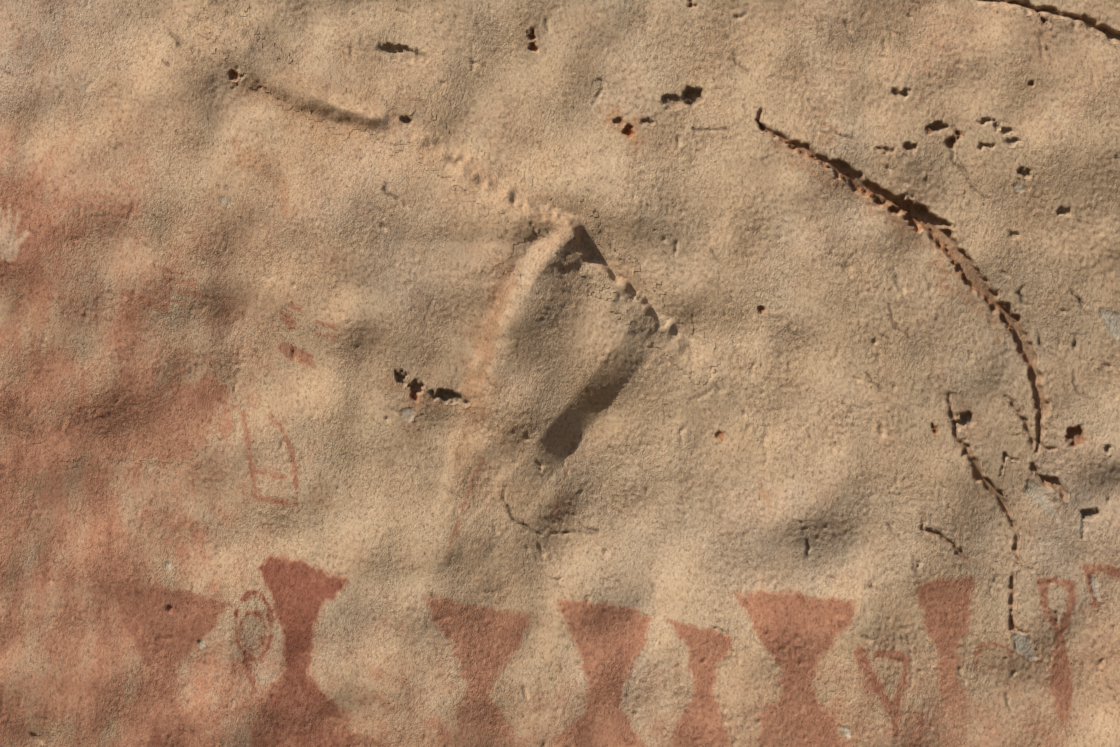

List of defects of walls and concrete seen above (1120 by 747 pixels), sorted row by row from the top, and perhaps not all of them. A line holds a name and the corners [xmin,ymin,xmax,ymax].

crack [968,0,1120,44]
crack [731,50,751,76]
crack [692,107,1094,636]